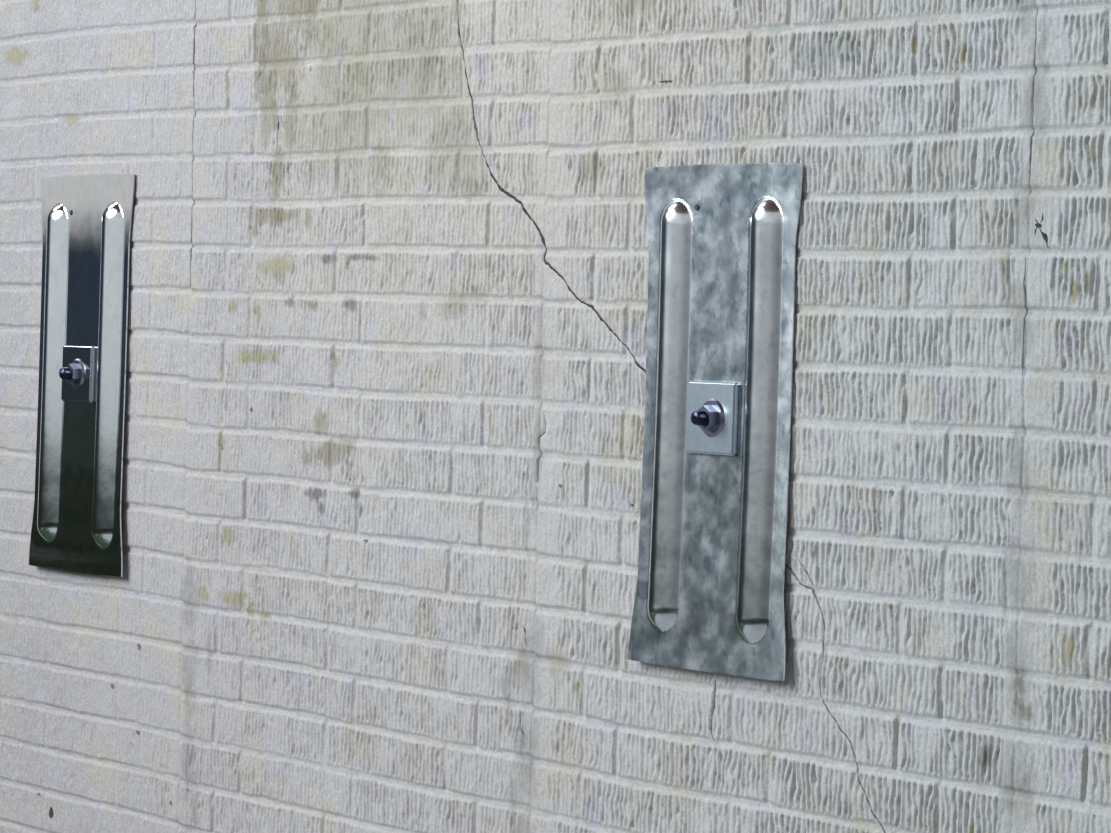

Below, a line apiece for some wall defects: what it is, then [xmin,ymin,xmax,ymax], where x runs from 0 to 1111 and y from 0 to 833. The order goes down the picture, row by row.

crack [456,0,646,374]
crack [537,415,546,482]
crack [708,680,716,741]
crack [785,555,886,833]